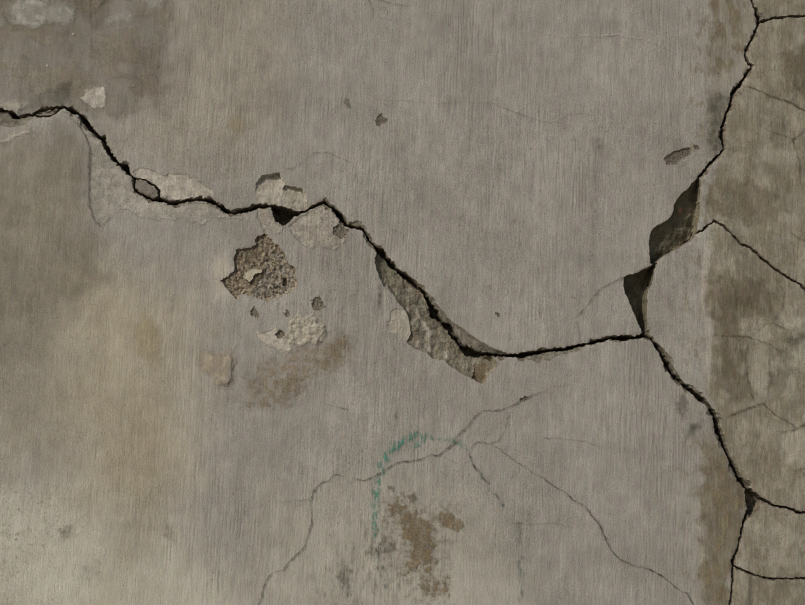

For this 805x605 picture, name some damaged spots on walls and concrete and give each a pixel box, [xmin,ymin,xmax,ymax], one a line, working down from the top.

peeling [80,86,105,108]
peeling [65,111,242,224]
spalling [664,145,700,165]
crack [694,0,805,203]
spalling [220,172,350,318]
peeling [253,296,326,351]
crack [0,104,645,363]
spalling [374,254,498,384]
crack [580,219,805,313]
crack [356,396,531,481]
crack [641,329,805,605]
crack [258,474,338,604]